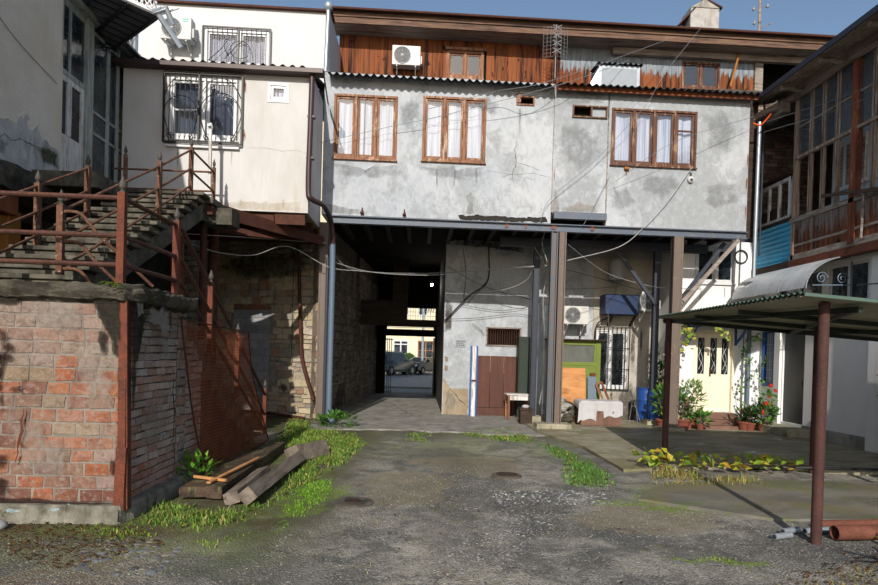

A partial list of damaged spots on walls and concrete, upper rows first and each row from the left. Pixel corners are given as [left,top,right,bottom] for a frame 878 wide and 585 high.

peeling [0,111,59,172]
water stain [0,329,12,372]